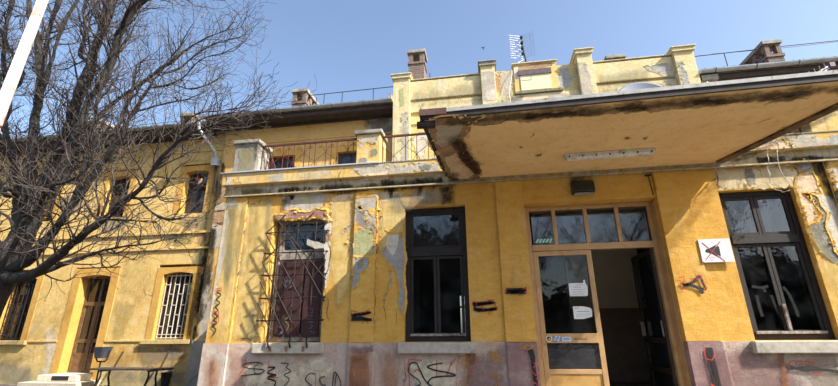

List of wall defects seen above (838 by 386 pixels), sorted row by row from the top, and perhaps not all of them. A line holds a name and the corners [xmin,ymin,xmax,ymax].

damp [450,138,479,174]
damp [447,106,605,125]
peeling [481,61,593,104]
peeling [351,88,809,181]
peeling [643,60,690,84]
damp [618,86,838,112]
damp [215,163,225,205]
peeling [713,126,838,287]
peeling [198,170,411,342]
damp [172,217,217,339]